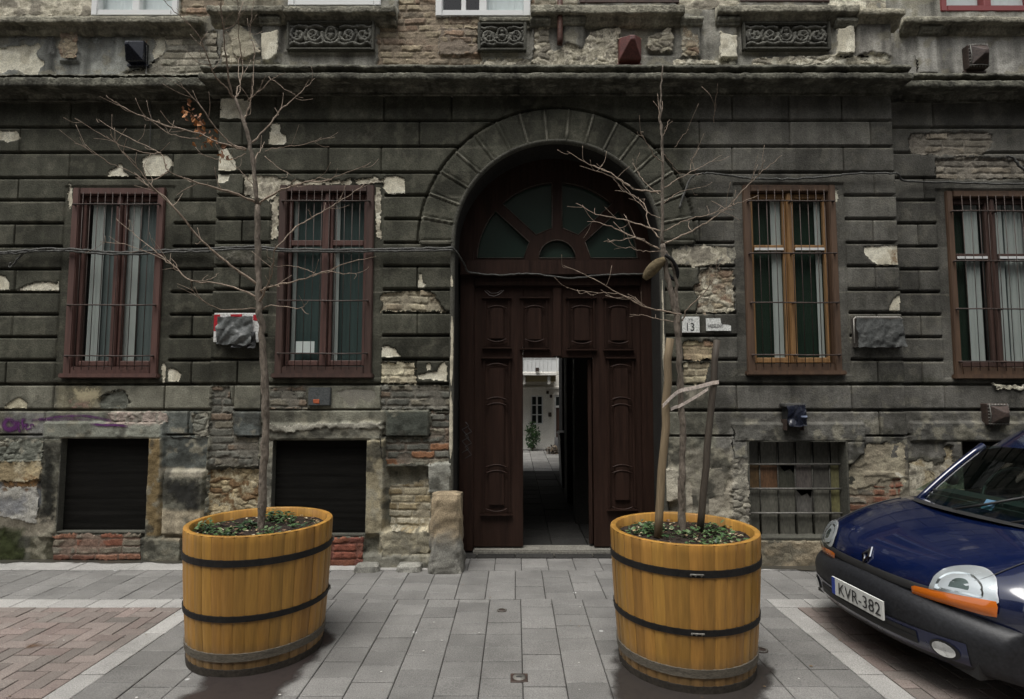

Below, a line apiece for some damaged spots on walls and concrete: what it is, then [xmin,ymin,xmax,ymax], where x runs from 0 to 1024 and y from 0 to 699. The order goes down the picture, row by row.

peeling [0,43,44,74]
flaking render [375,0,621,65]
flaking render [646,27,738,65]
peeling [142,154,174,176]
flaking render [218,148,405,239]
flaking render [908,132,1024,181]
flaking render [672,245,736,315]
peeling [864,245,898,266]
flaking render [191,274,453,515]
peeling [0,438,44,523]
flaking render [708,458,751,524]
flaking render [849,442,955,512]